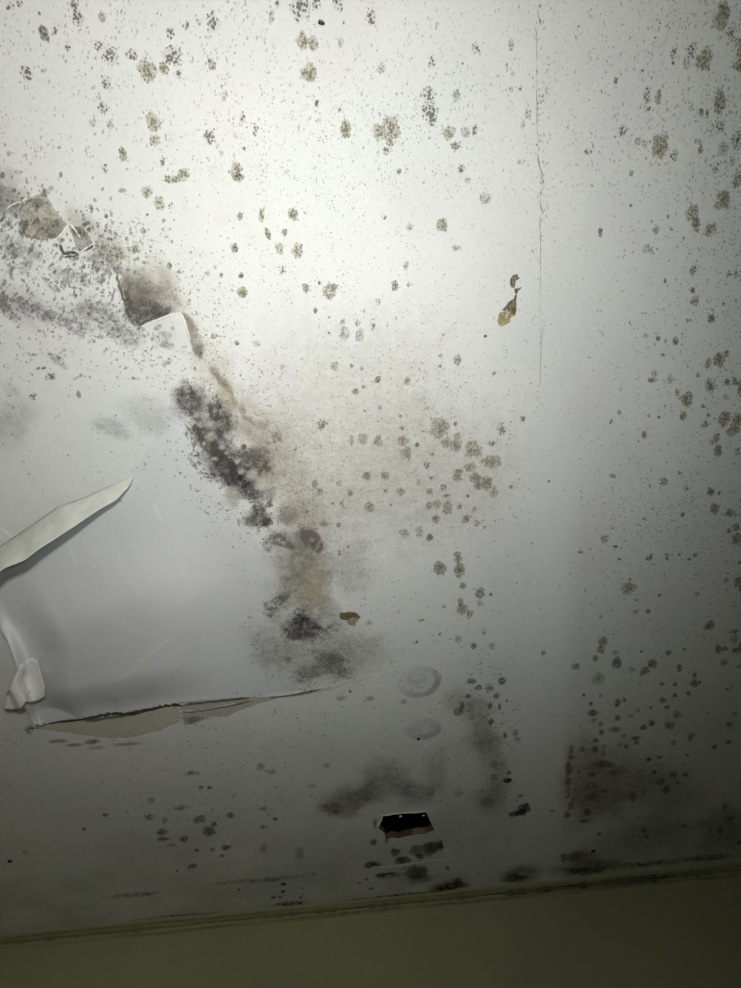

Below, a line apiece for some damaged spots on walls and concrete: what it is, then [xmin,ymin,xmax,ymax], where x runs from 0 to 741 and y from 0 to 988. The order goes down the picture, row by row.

water stain [670,43,714,71]
water stain [652,135,678,161]
mould [699,89,741,150]
peeling [7,192,94,258]
peeling [115,267,202,356]
water stain [175,367,283,526]
peeling [0,475,134,572]
water stain [565,665,701,824]
spalling [376,811,431,832]